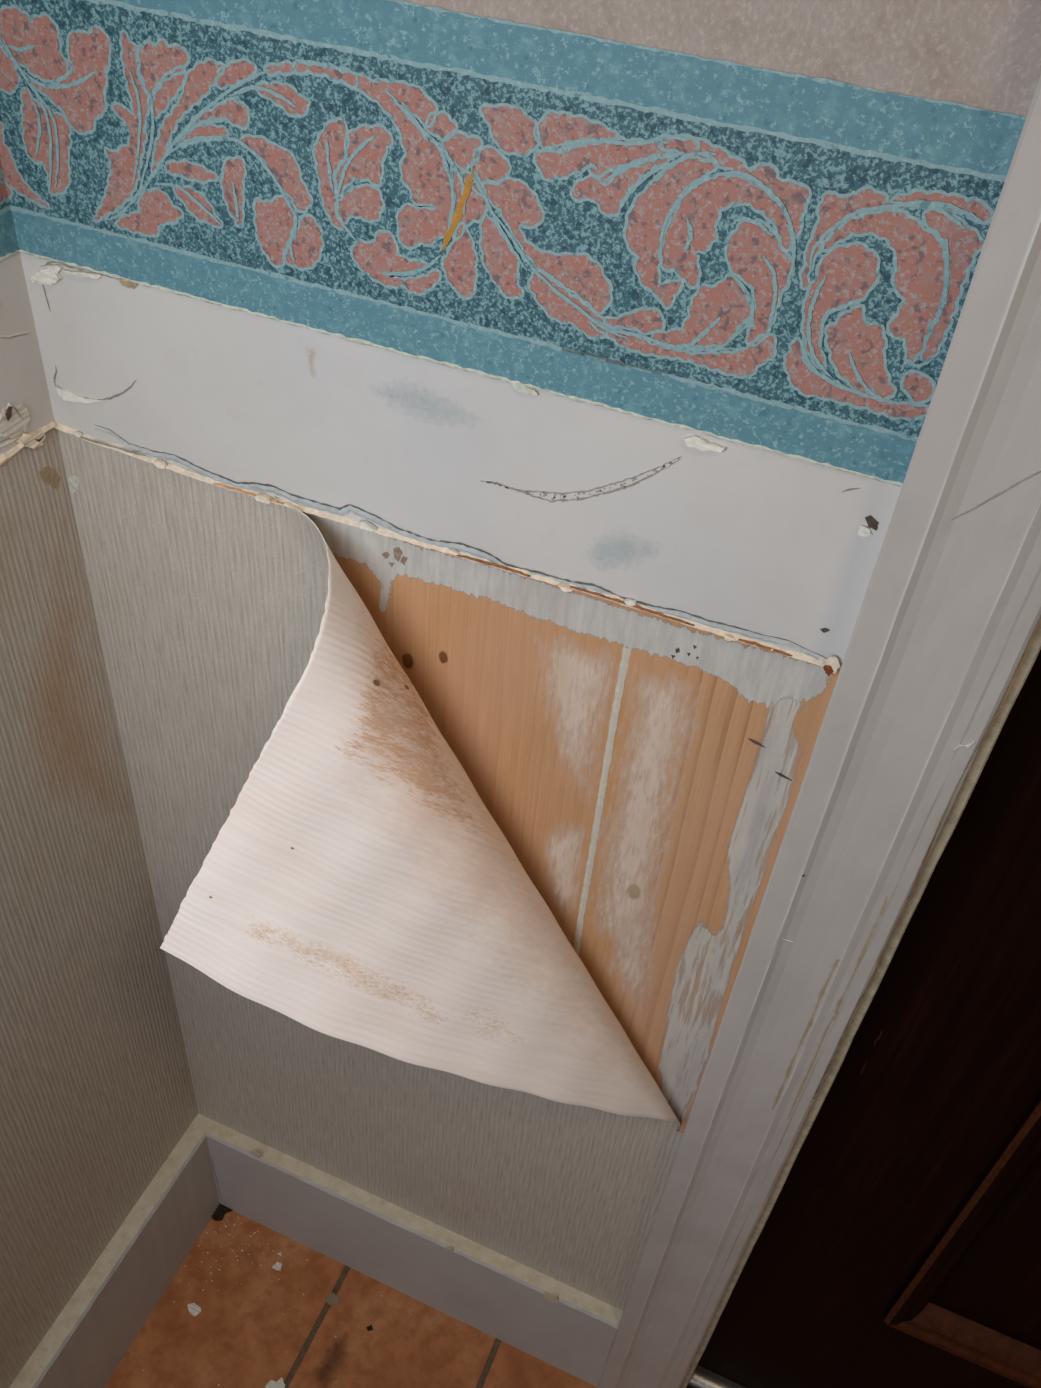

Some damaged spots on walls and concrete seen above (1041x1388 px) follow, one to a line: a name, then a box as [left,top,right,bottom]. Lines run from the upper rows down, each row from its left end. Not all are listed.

spalling [0,403,31,438]
crack [0,365,827,667]
peeling [160,492,832,1131]